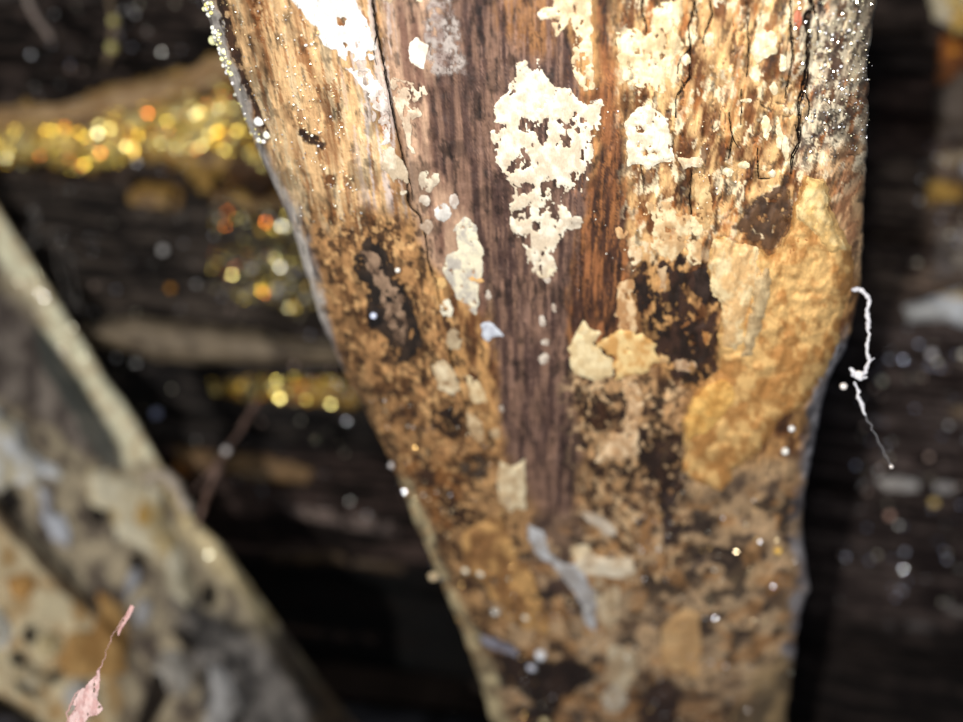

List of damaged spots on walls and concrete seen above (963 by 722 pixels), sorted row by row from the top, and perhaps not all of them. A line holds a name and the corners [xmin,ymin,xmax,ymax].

peeling [292,0,428,195]
crack [371,0,440,304]
peeling [408,0,465,75]
peeling [537,264,556,278]
peeling [557,216,584,230]
peeling [568,279,696,463]
crack [687,170,695,240]
crack [675,0,713,118]
peeling [624,105,855,491]
crack [728,0,819,179]